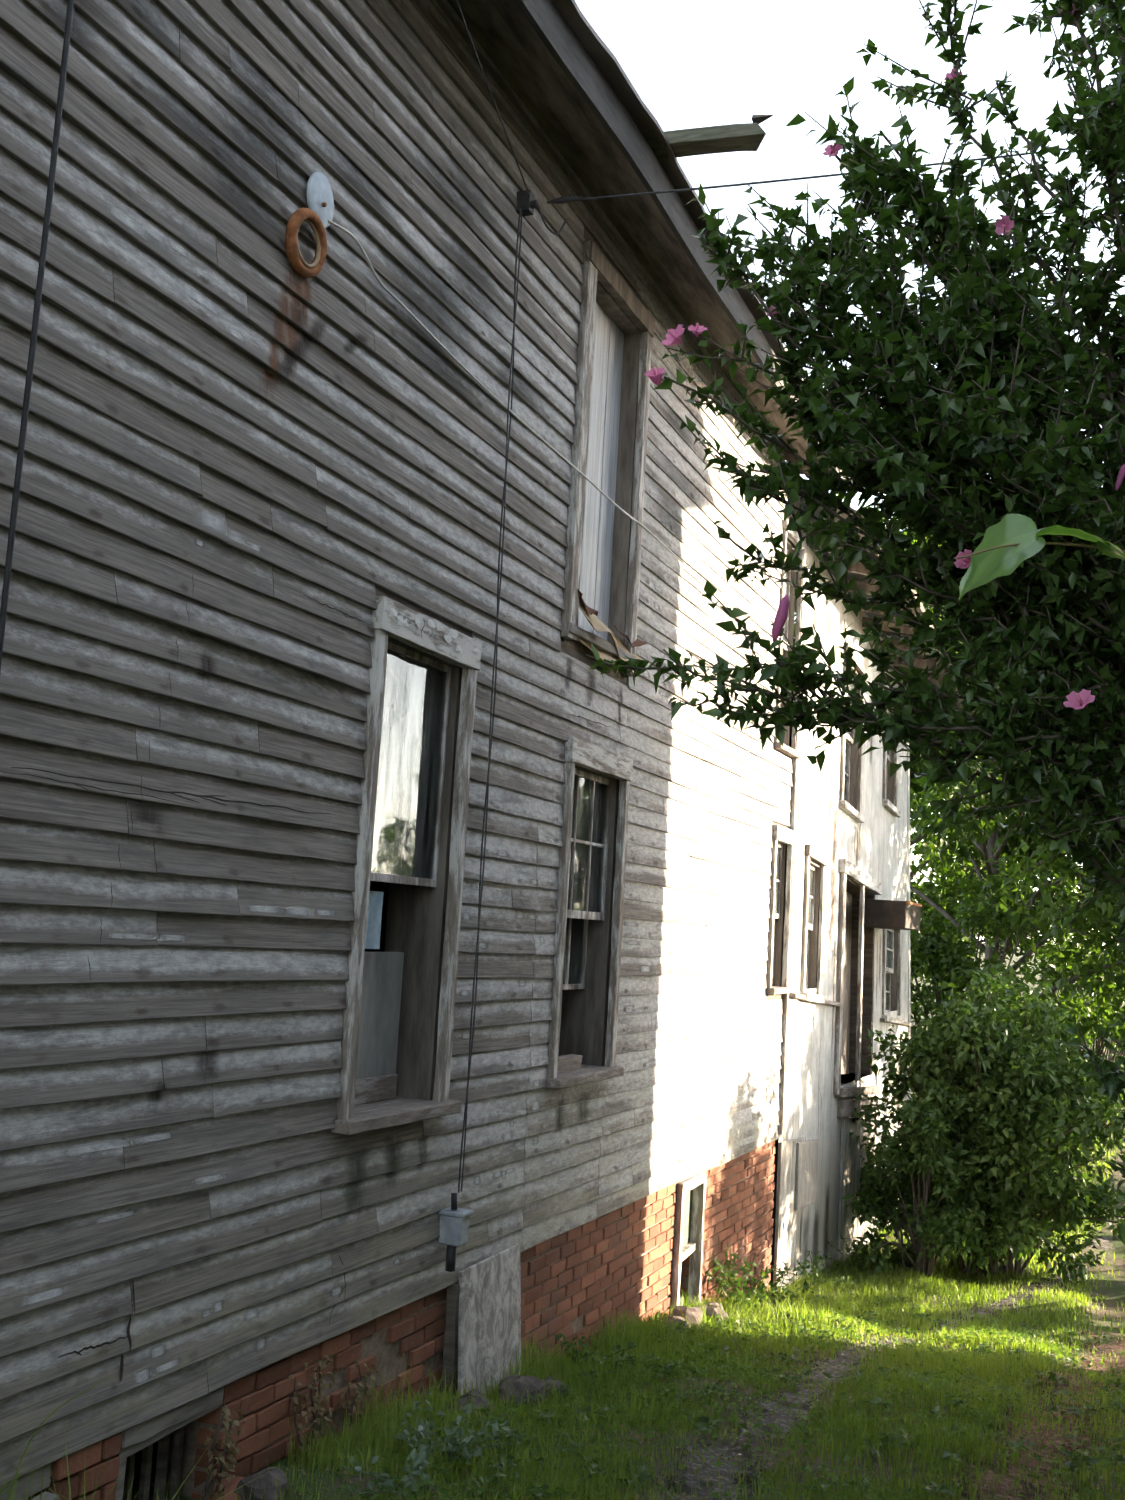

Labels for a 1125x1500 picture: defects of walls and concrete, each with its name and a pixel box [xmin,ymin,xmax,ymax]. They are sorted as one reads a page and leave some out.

rust [285,208,327,278]
crack [58,1280,135,1381]